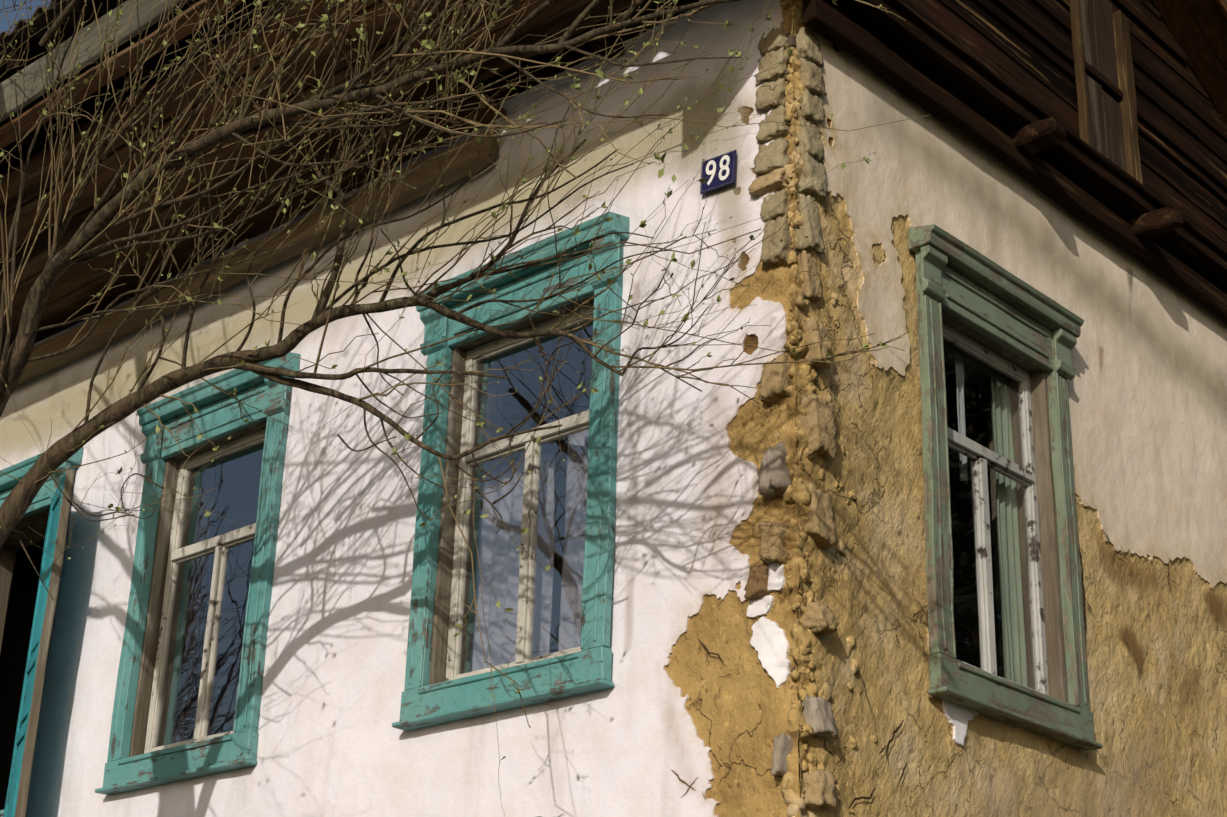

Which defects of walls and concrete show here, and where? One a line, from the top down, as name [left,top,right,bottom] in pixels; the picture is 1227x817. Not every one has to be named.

flaking render [665,0,1227,817]
crack [698,639,724,663]
crack [1079,529,1130,663]
crack [671,769,706,800]
crack [849,664,907,809]